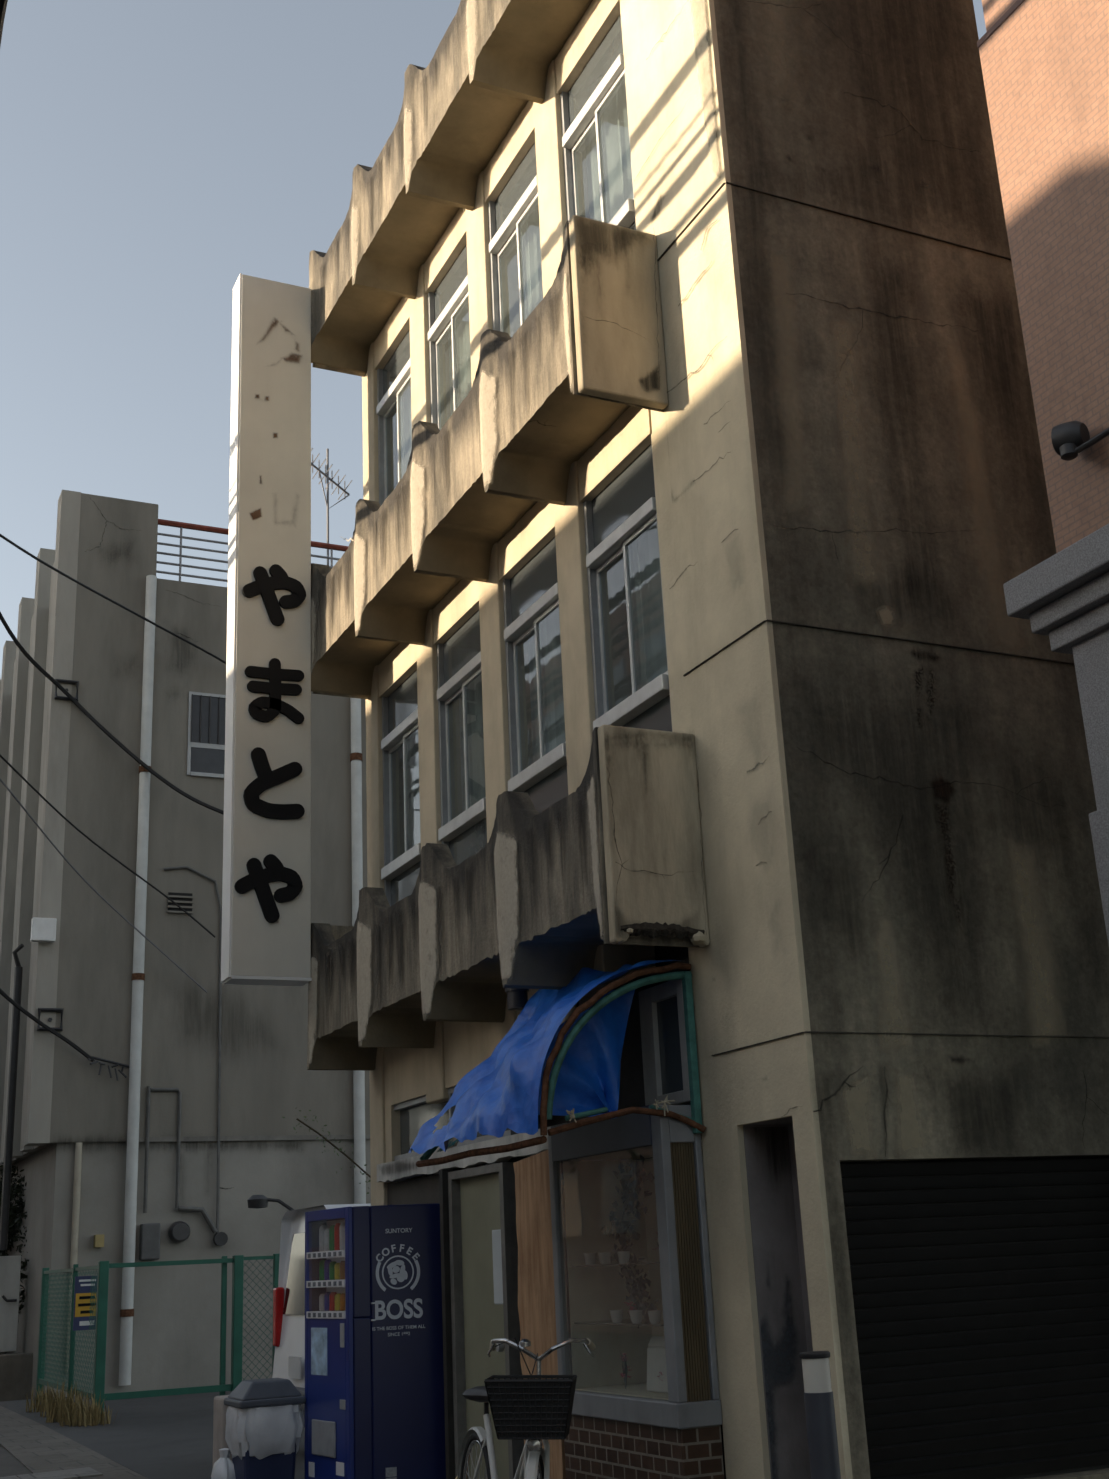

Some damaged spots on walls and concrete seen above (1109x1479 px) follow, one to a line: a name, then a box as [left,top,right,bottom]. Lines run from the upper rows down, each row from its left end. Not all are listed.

water stain [578,219,643,264]
rust [262,321,300,362]
water stain [640,368,659,391]
crack [608,775,707,934]
water stain [761,1282,796,1479]